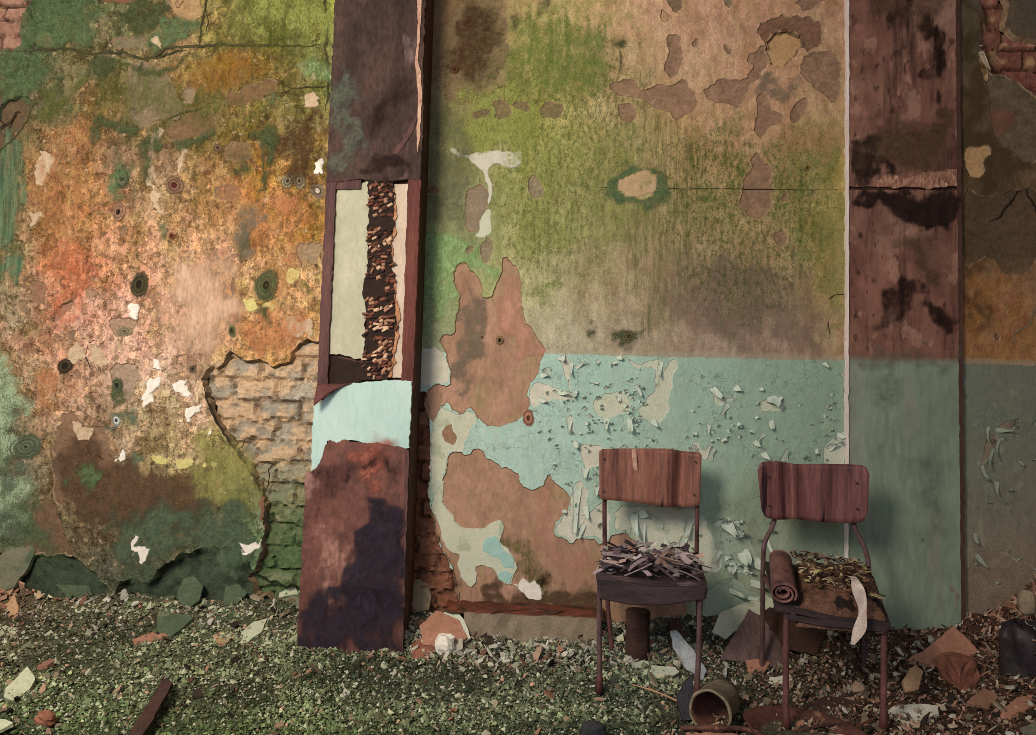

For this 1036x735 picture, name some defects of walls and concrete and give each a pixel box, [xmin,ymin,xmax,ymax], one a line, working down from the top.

spalling [0,0,32,54]
peeling [609,0,843,138]
spalling [961,0,1036,274]
peeling [738,152,773,219]
crack [989,189,1036,222]
spalling [9,338,322,602]
peeling [413,184,789,623]
peeling [803,393,846,464]
peeling [980,418,1022,506]
peeling [965,533,1036,617]